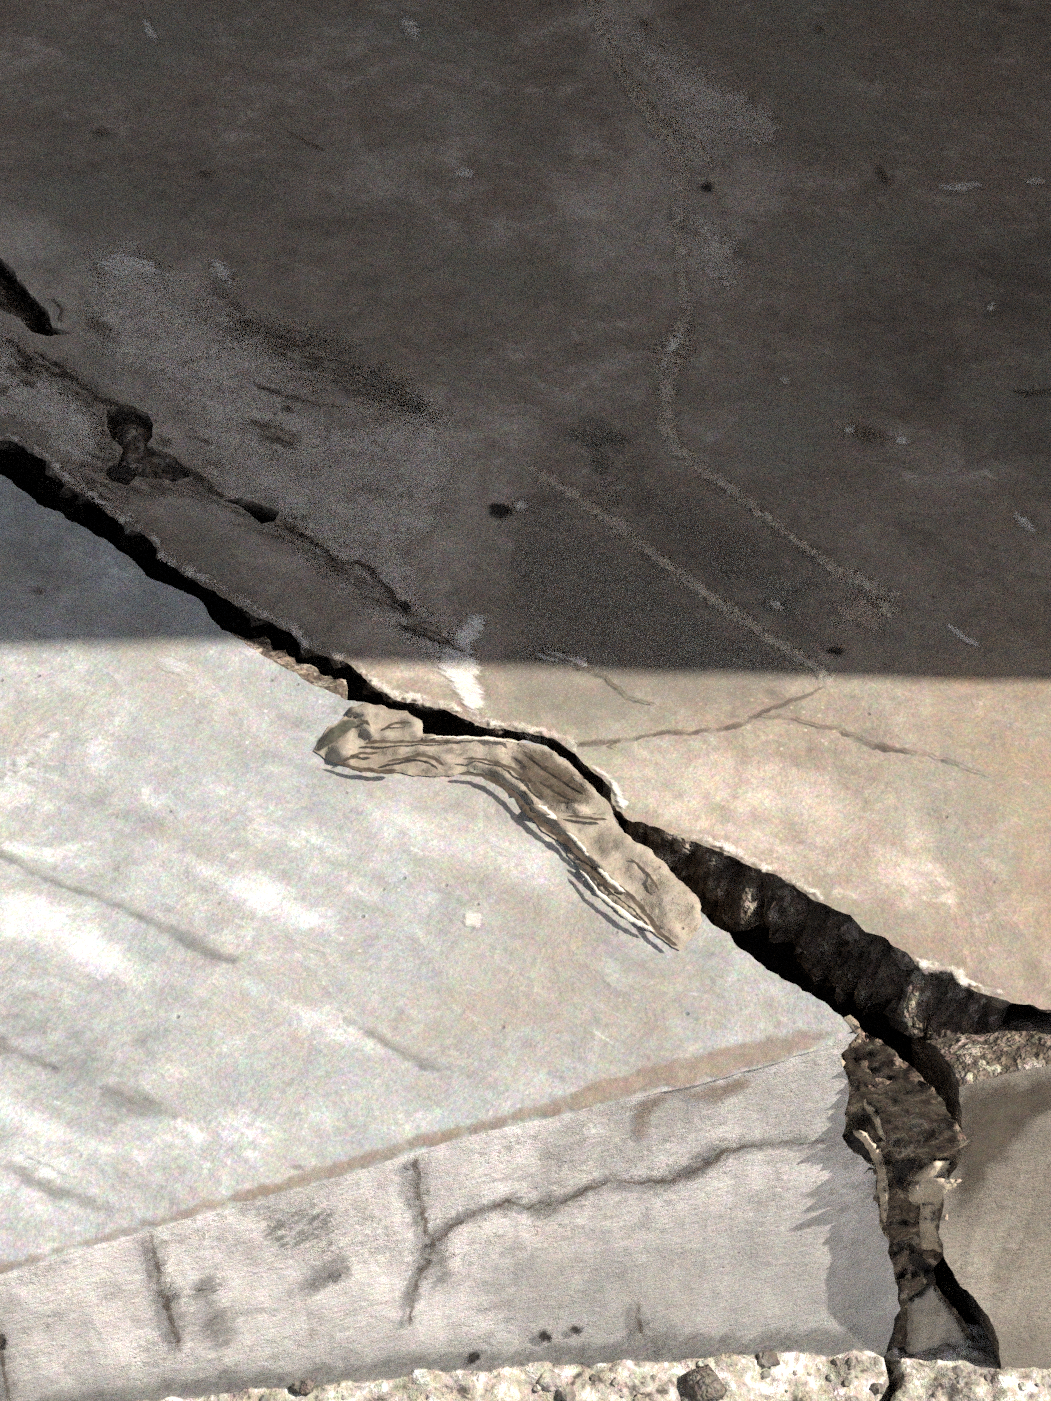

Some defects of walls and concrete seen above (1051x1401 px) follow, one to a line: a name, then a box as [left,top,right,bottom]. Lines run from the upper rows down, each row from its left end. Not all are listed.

crack [0,258,138,412]
crack [253,382,336,411]
crack [0,440,1051,1068]
spalling [707,838,778,871]
spalling [917,958,1002,992]
crack [406,1137,828,1324]
spalling [841,1008,1051,1367]
crack [0,1324,16,1401]
crack [144,1237,185,1352]
crack [632,1304,670,1357]